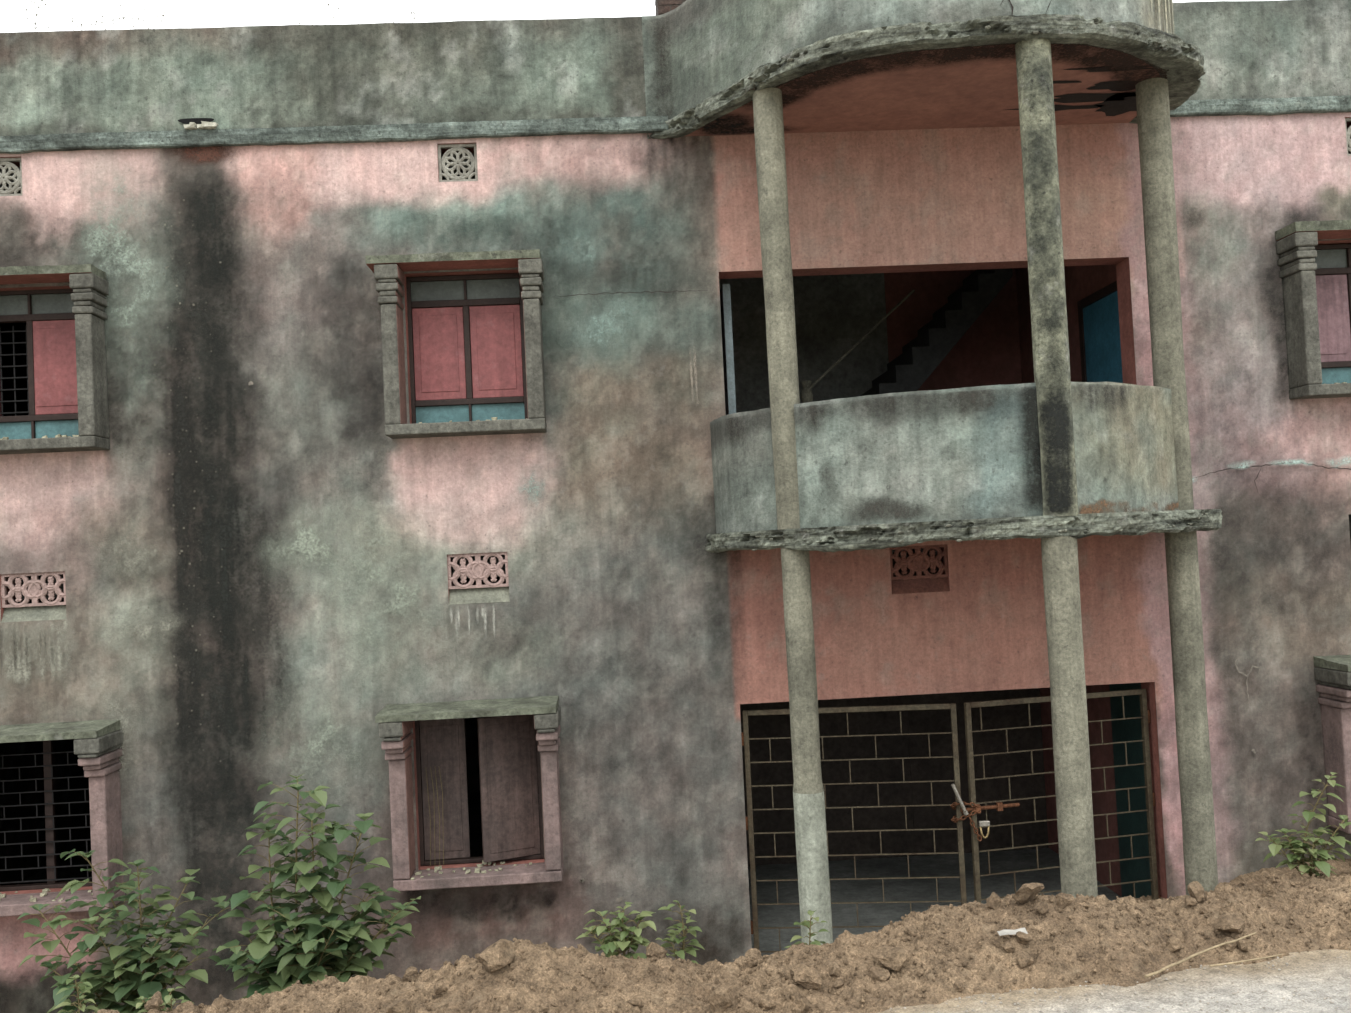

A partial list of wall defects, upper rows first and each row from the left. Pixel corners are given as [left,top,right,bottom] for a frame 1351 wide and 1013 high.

peeling [1053,65,1152,116]
crack [1195,462,1351,492]
leakage [72,174,336,988]
leakage [450,608,495,630]
leakage [0,619,68,682]